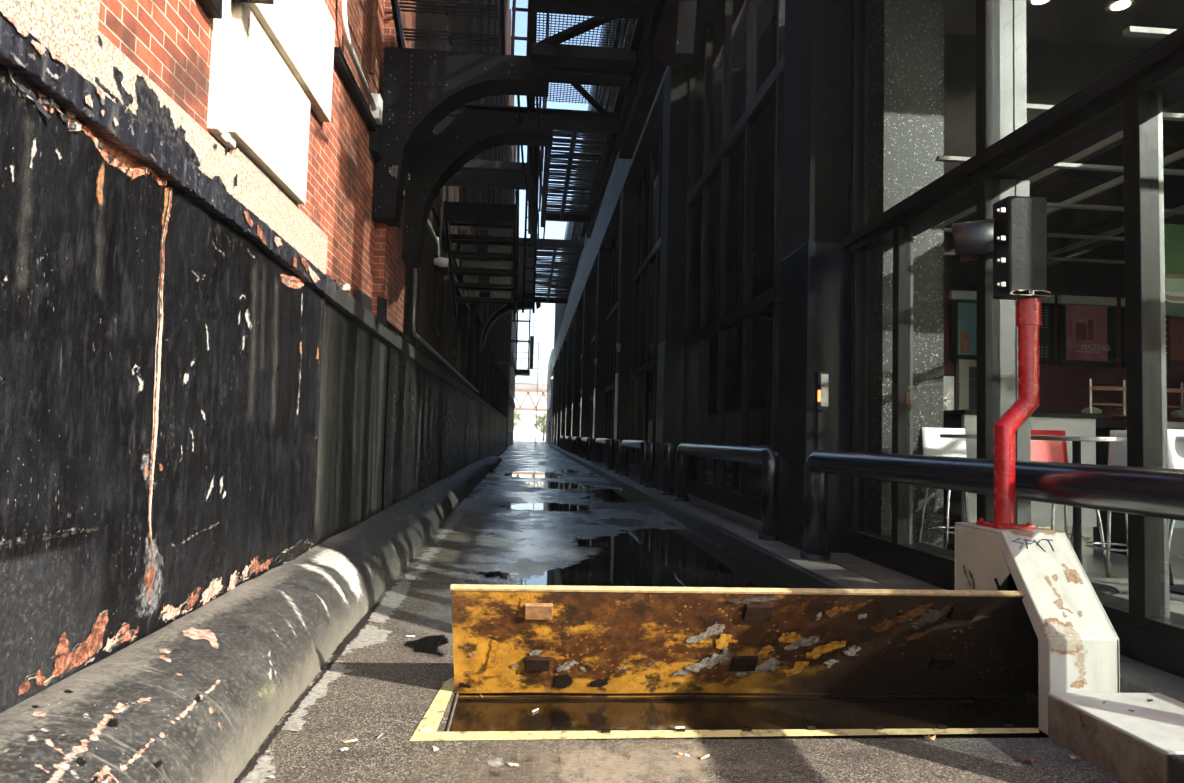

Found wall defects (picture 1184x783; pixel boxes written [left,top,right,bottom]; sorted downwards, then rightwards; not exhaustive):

peeling [0,7,67,78]
spalling [0,56,167,186]
corrosion [96,164,104,206]
peeling [18,610,139,695]
peeling [673,647,735,676]
peeling [686,622,725,643]
peeling [735,635,820,677]
peeling [823,645,861,668]
corrosion [1043,564,1087,688]